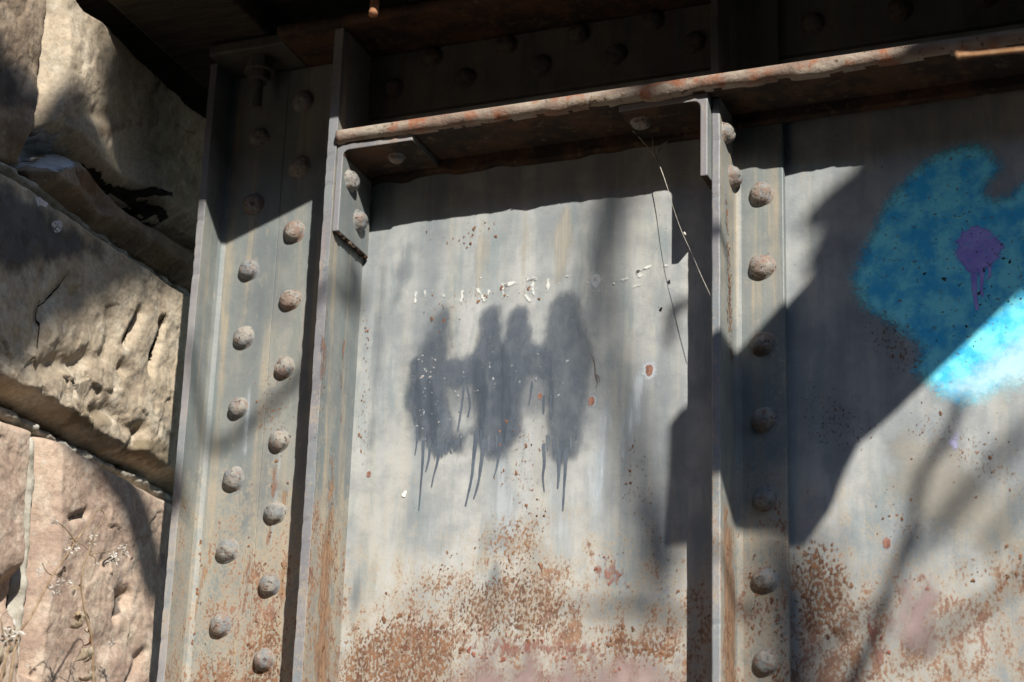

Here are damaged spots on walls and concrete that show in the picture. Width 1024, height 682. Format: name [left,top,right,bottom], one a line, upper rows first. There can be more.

crack [35,277,65,348]
rust [642,362,656,380]
rust [268,448,289,505]
rust [195,540,206,618]
rust [189,558,287,682]
rust [314,420,686,682]
rust [748,539,860,682]
rust [864,614,891,664]
rust [955,544,1024,589]